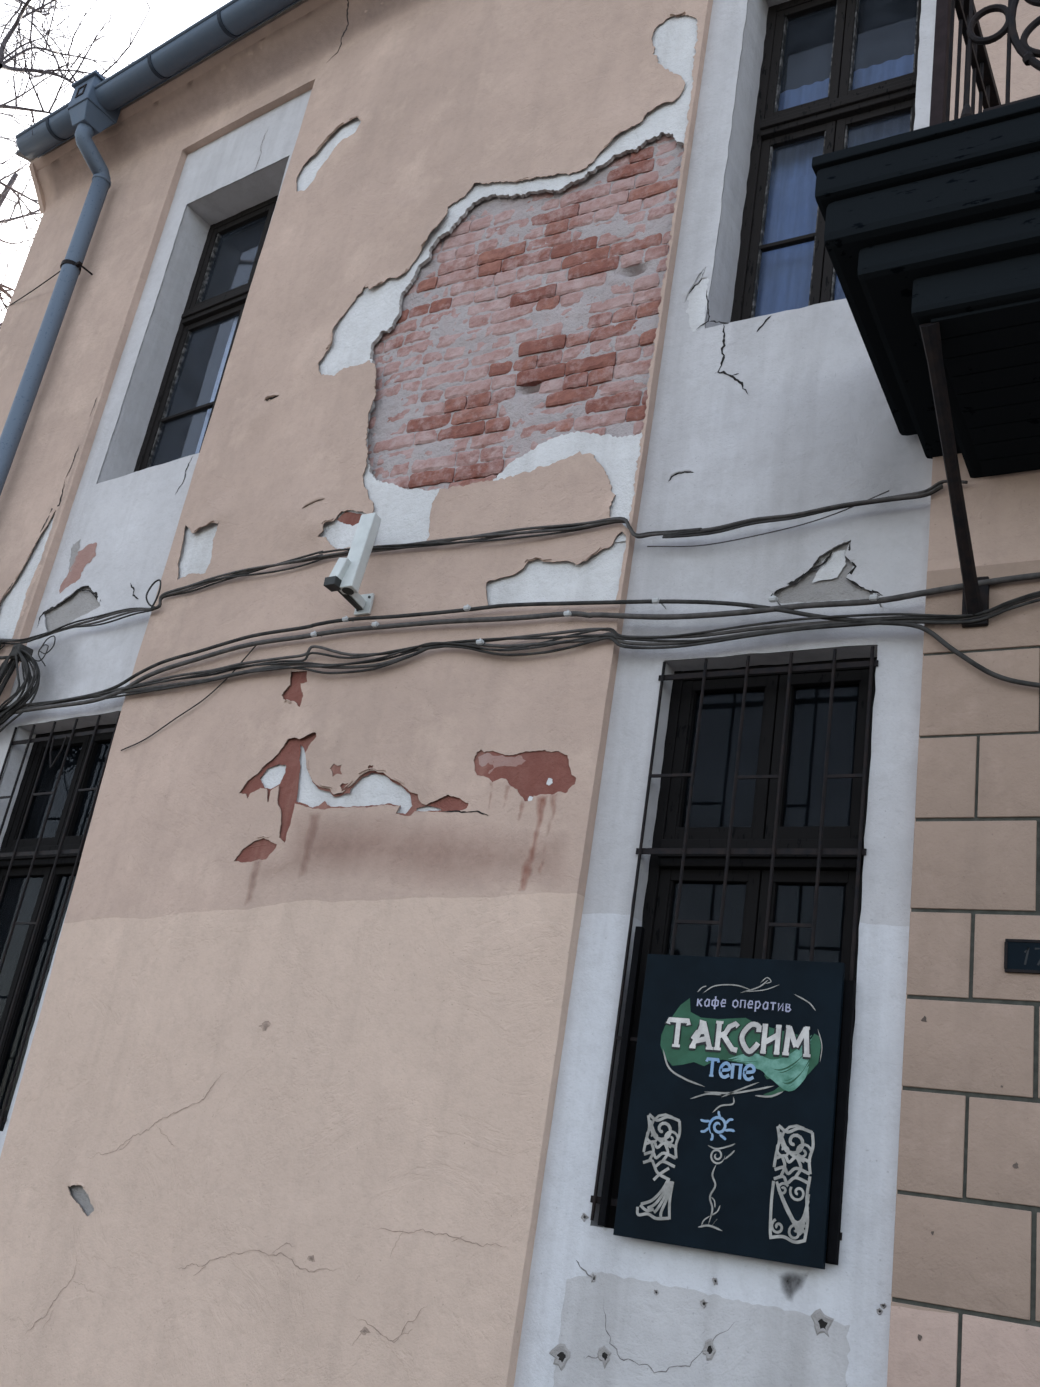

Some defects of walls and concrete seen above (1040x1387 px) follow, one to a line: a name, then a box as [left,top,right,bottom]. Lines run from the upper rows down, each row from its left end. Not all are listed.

crack [331,0,349,58]
peeling [297,116,361,191]
peeling [318,11,698,605]
crack [689,267,772,394]
spalling [38,539,101,632]
spalling [768,541,883,603]
peeling [235,733,488,863]
peeling [474,750,576,801]
crack [88,1072,225,1159]
crack [175,1243,339,1276]
crack [382,1228,502,1257]
crack [576,1260,739,1373]